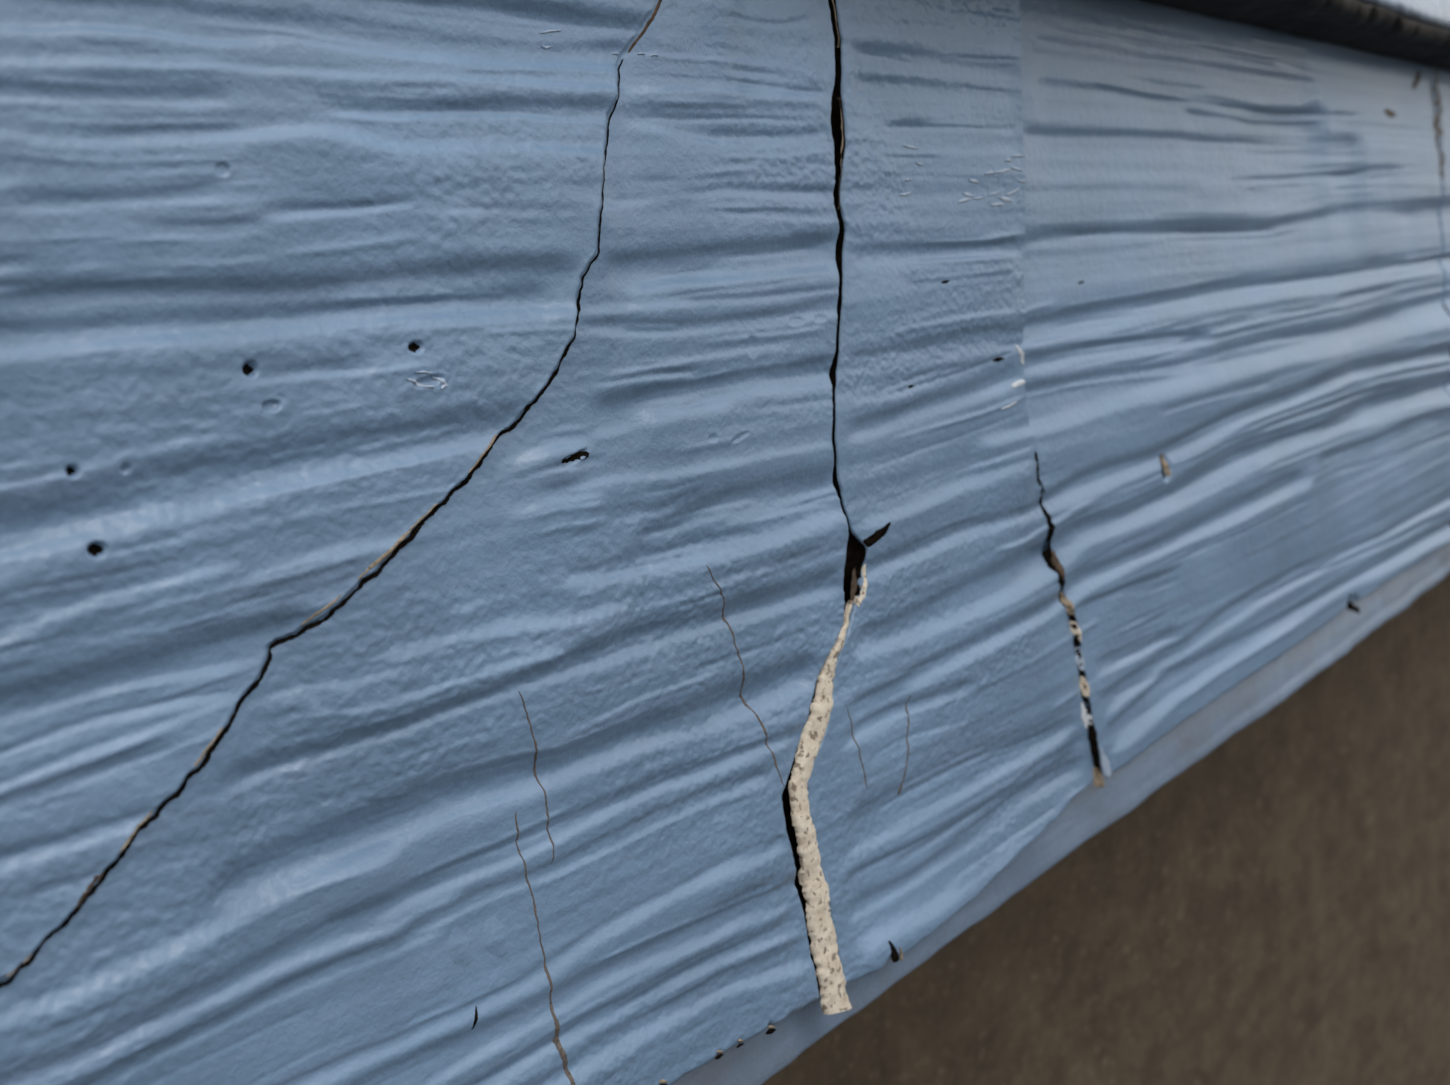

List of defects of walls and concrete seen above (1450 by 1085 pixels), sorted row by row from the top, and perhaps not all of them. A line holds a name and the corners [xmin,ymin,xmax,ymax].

crack [0,0,662,988]
crack [515,691,575,1085]
crack [706,0,911,1015]
crack [1035,451,1102,773]